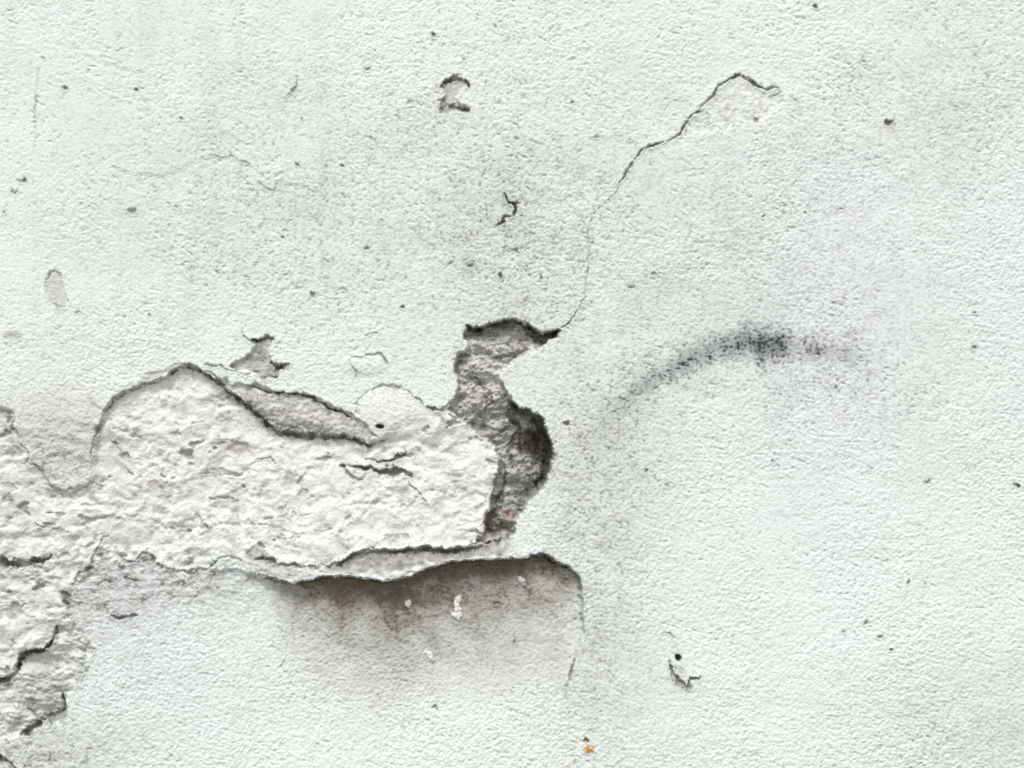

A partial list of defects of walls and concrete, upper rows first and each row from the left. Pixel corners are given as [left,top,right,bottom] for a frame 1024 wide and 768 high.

peeling [436,58,473,116]
crack [495,190,526,252]
crack [560,71,801,329]
flaking render [0,315,563,743]
peeling [664,653,703,695]